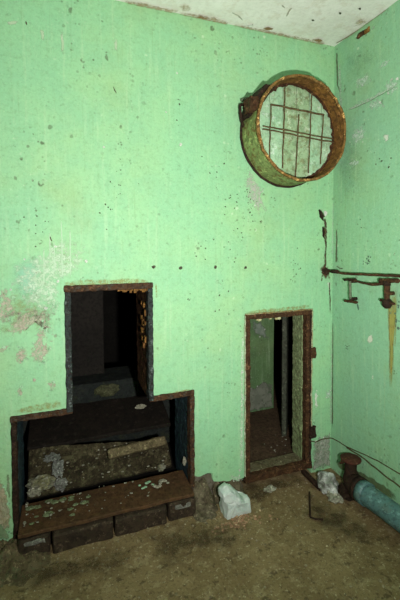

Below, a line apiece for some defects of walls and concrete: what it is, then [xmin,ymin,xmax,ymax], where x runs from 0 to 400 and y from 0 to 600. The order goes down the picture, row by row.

peeling [0,243,88,364]
corrosion [388,299,396,377]